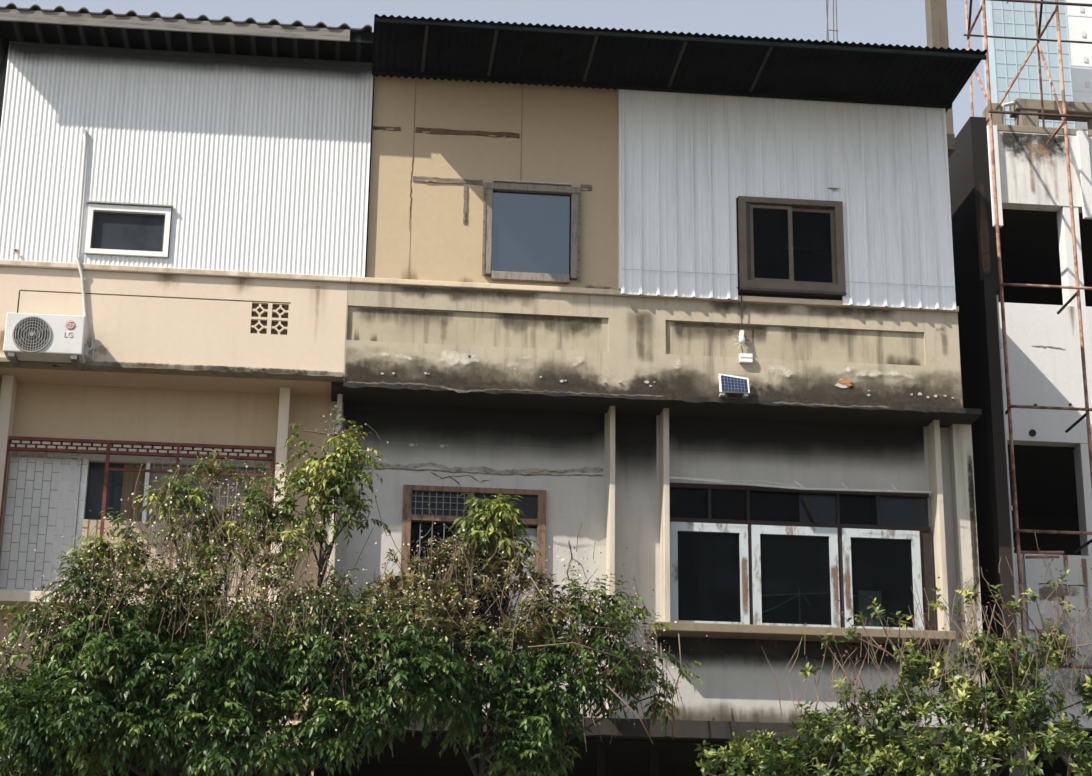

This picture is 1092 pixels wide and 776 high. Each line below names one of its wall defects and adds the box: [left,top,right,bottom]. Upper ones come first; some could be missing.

water stain [1002,132,1065,156]
water stain [400,286,535,300]
water stain [362,308,448,318]
water stain [712,301,788,312]
water stain [808,306,892,315]
water stain [502,314,601,329]
water stain [675,322,766,339]
water stain [787,327,854,337]
water stain [345,359,963,412]
water stain [343,402,657,465]
water stain [669,416,925,458]